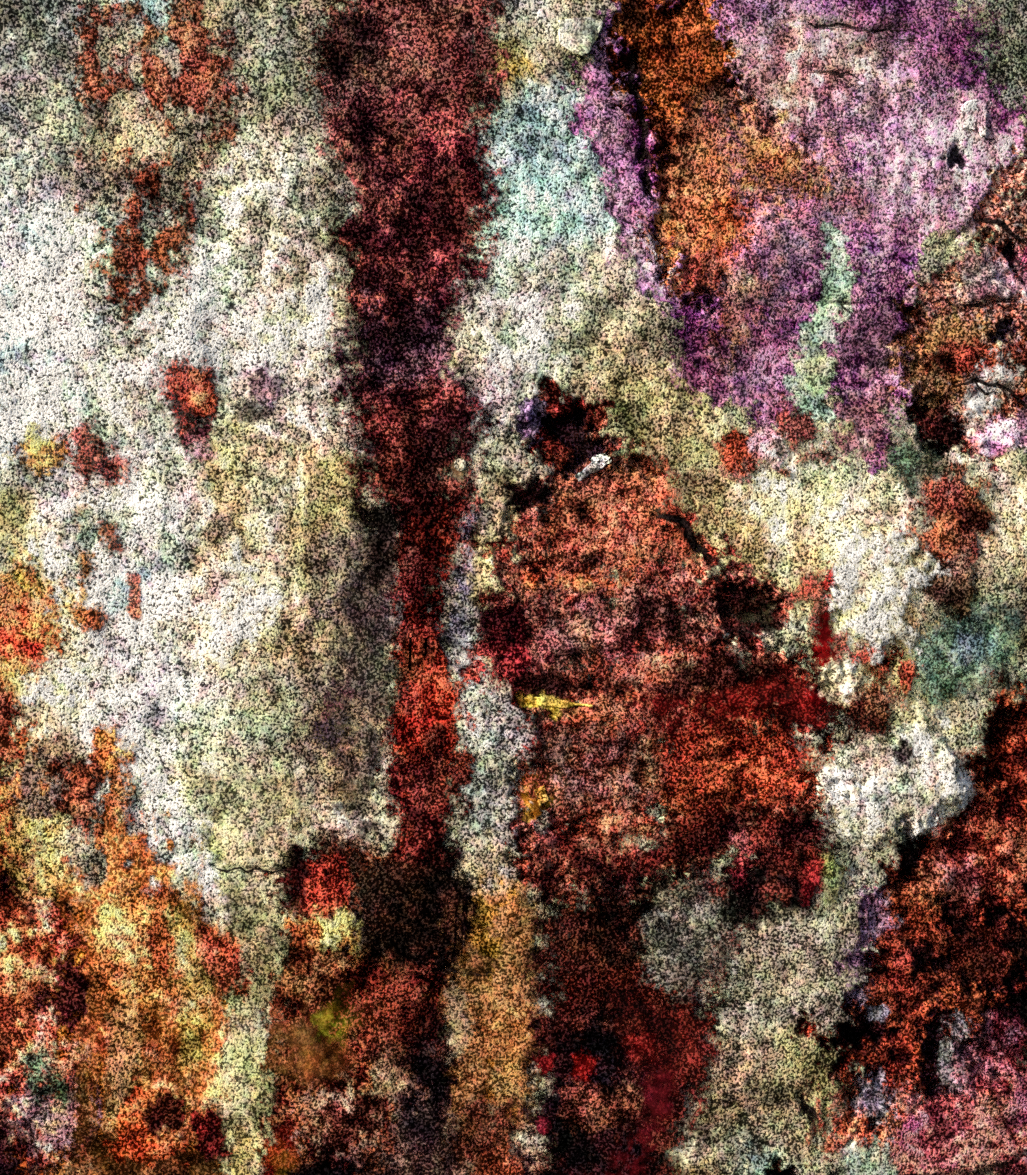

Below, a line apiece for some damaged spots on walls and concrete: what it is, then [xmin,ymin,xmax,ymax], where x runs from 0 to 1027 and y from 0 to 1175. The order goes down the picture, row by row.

rust [72,0,248,323]
rust [679,86,760,182]
rust [778,140,860,214]
rust [703,238,780,375]
rust [306,0,510,868]
rust [712,392,840,483]
rust [126,572,141,620]
rust [787,565,838,641]
rust [0,519,122,862]
rust [833,632,919,740]
rust [0,723,253,1172]
rust [254,933,455,1175]